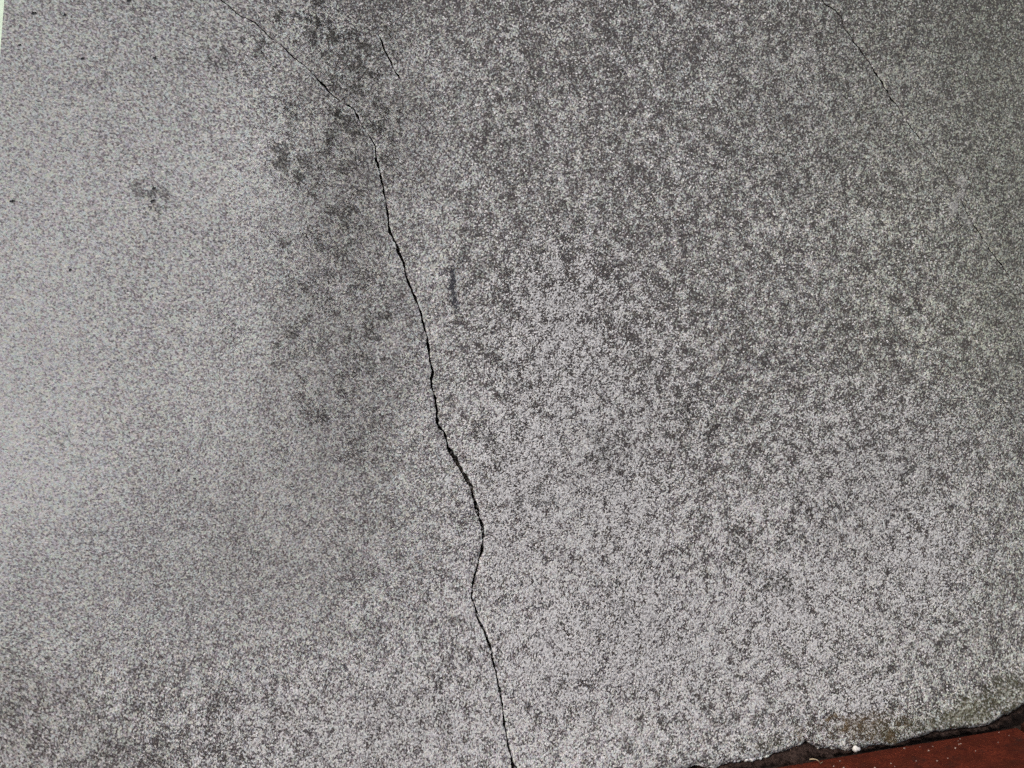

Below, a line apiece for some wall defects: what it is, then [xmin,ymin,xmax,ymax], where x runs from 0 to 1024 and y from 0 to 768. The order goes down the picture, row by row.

crack [221,0,517,768]